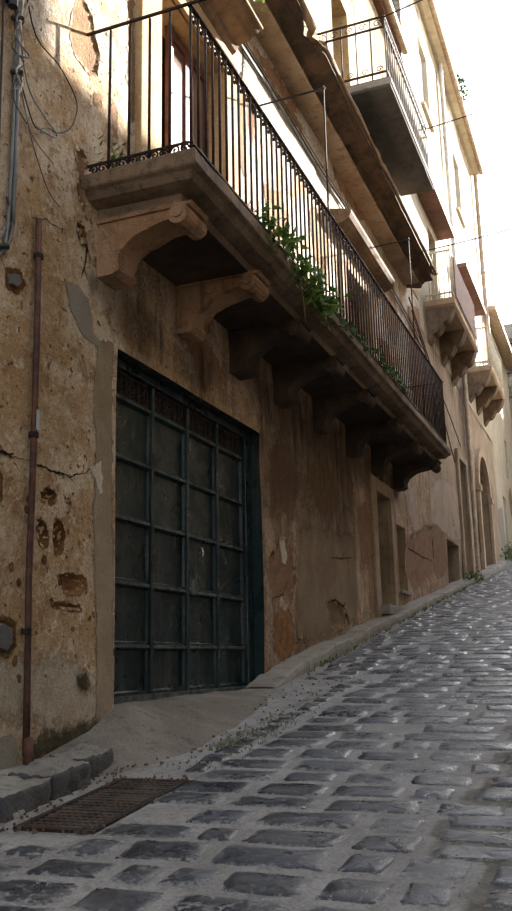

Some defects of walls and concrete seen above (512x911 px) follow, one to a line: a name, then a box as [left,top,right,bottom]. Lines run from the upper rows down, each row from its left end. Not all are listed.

flaking render [69,0,101,77]
flaking render [126,0,136,123]
flaking render [94,92,119,138]
crack [0,450,90,483]
spalling [24,496,69,564]
spalling [40,486,72,506]
flaking render [405,523,448,593]
spalling [50,569,91,621]
flaking render [266,534,307,663]
crack [326,593,349,621]